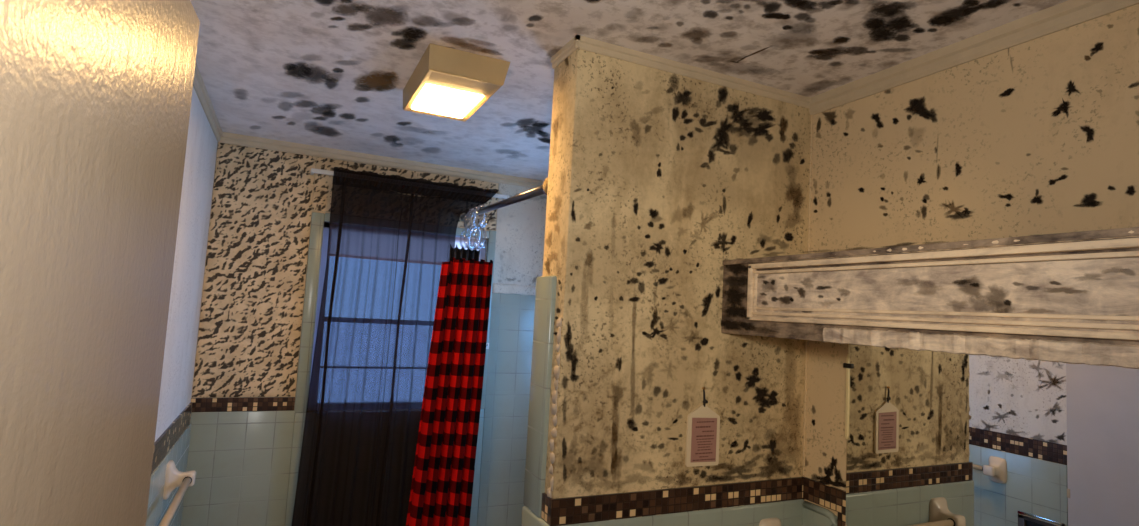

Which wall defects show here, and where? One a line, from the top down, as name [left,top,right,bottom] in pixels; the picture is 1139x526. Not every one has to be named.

water stain [316,0,427,48]
water stain [752,0,858,30]
water stain [808,0,1019,66]
water stain [287,63,344,89]
water stain [518,119,550,144]
water stain [668,77,805,167]
water stain [871,97,937,128]
water stain [1074,186,1136,207]
water stain [617,199,699,339]
water stain [545,259,579,388]
water stain [695,233,793,375]
water stain [728,365,786,424]